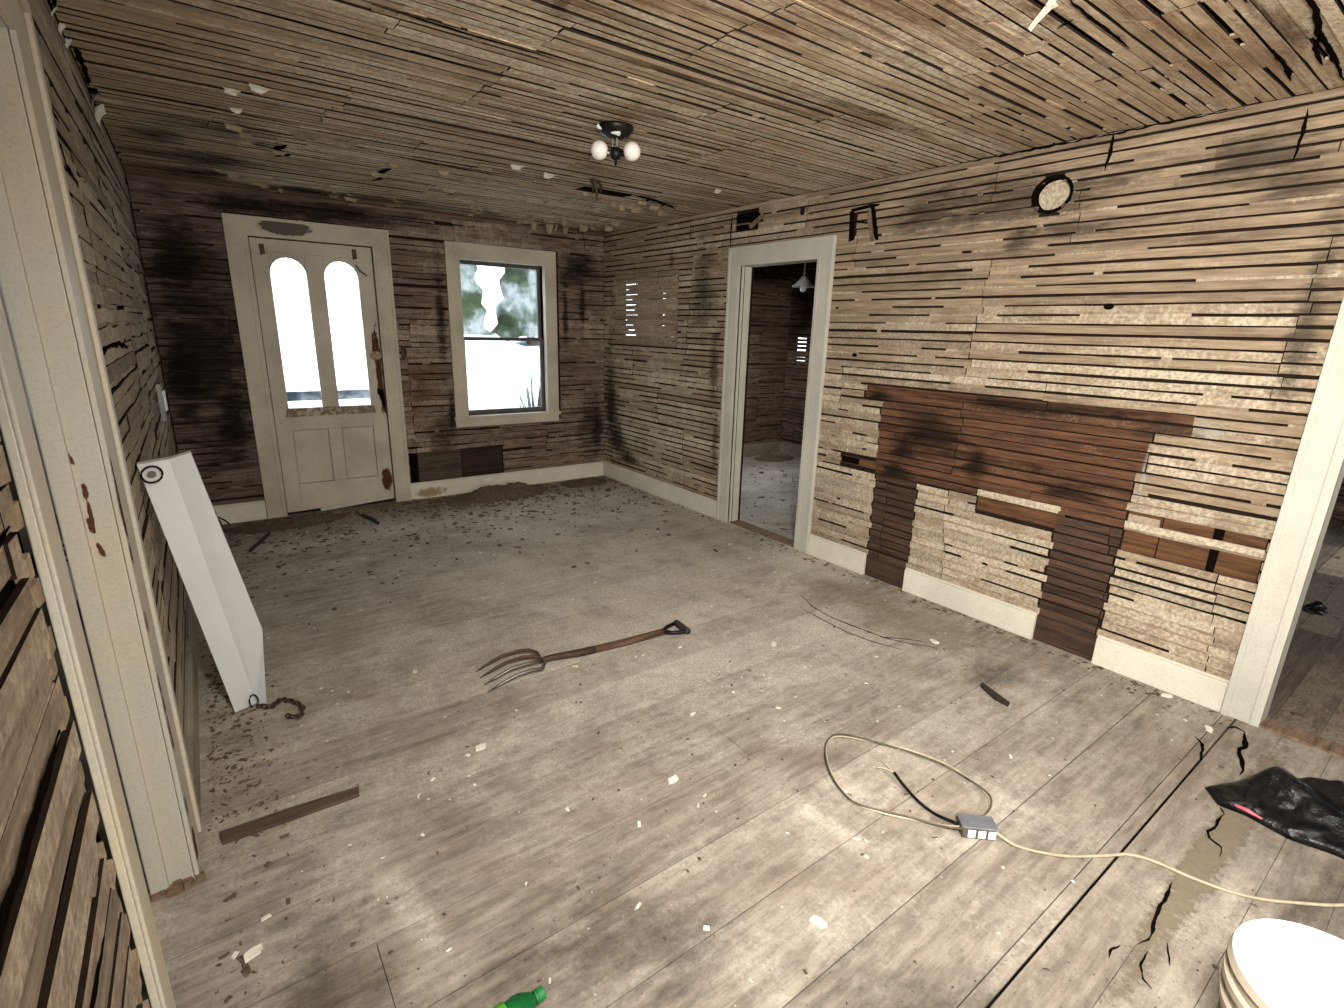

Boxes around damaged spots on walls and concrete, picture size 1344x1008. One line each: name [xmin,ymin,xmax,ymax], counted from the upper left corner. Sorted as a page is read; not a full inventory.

crack [1273,0,1344,81]
crack [1292,109,1309,162]
rust [382,467,393,491]
crack [986,726,1249,1008]